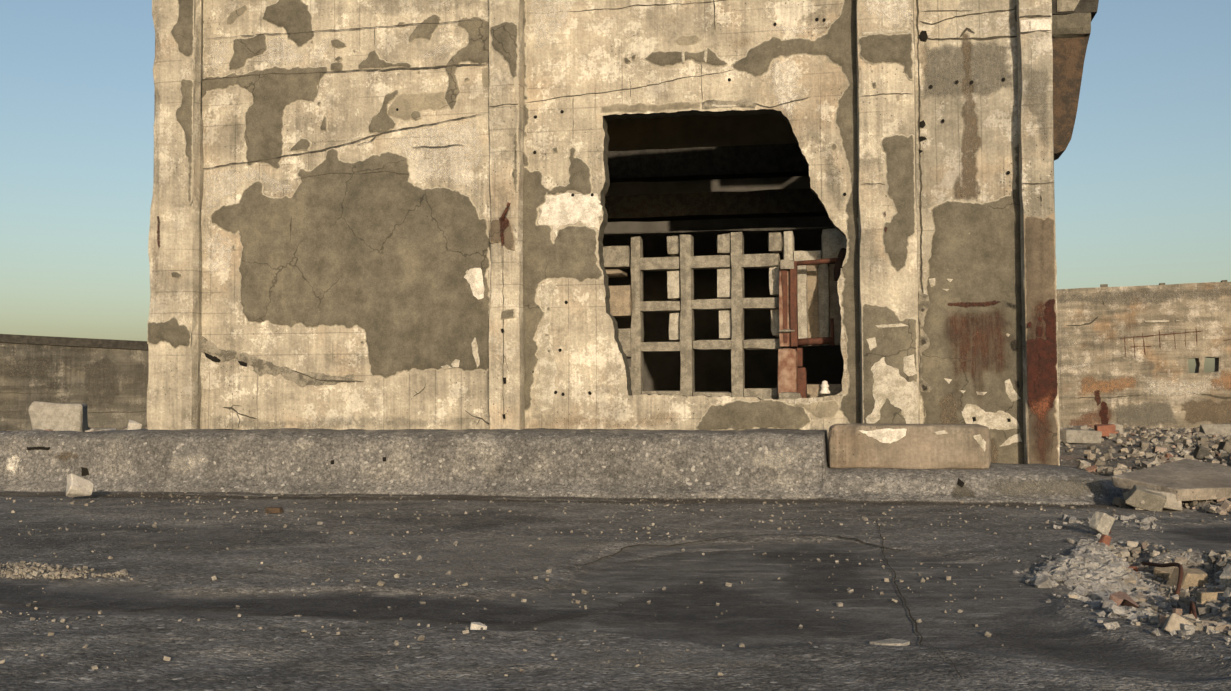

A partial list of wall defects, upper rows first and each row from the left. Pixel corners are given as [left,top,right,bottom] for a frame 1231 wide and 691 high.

crack [527,0,724,26]
leakage [924,33,1012,199]
peeling [170,0,603,412]
peeling [600,0,1059,465]
peeling [147,315,191,350]
rust [947,300,1004,381]
rust [1027,299,1058,463]
rust [1071,390,1110,426]
crack [813,512,962,678]